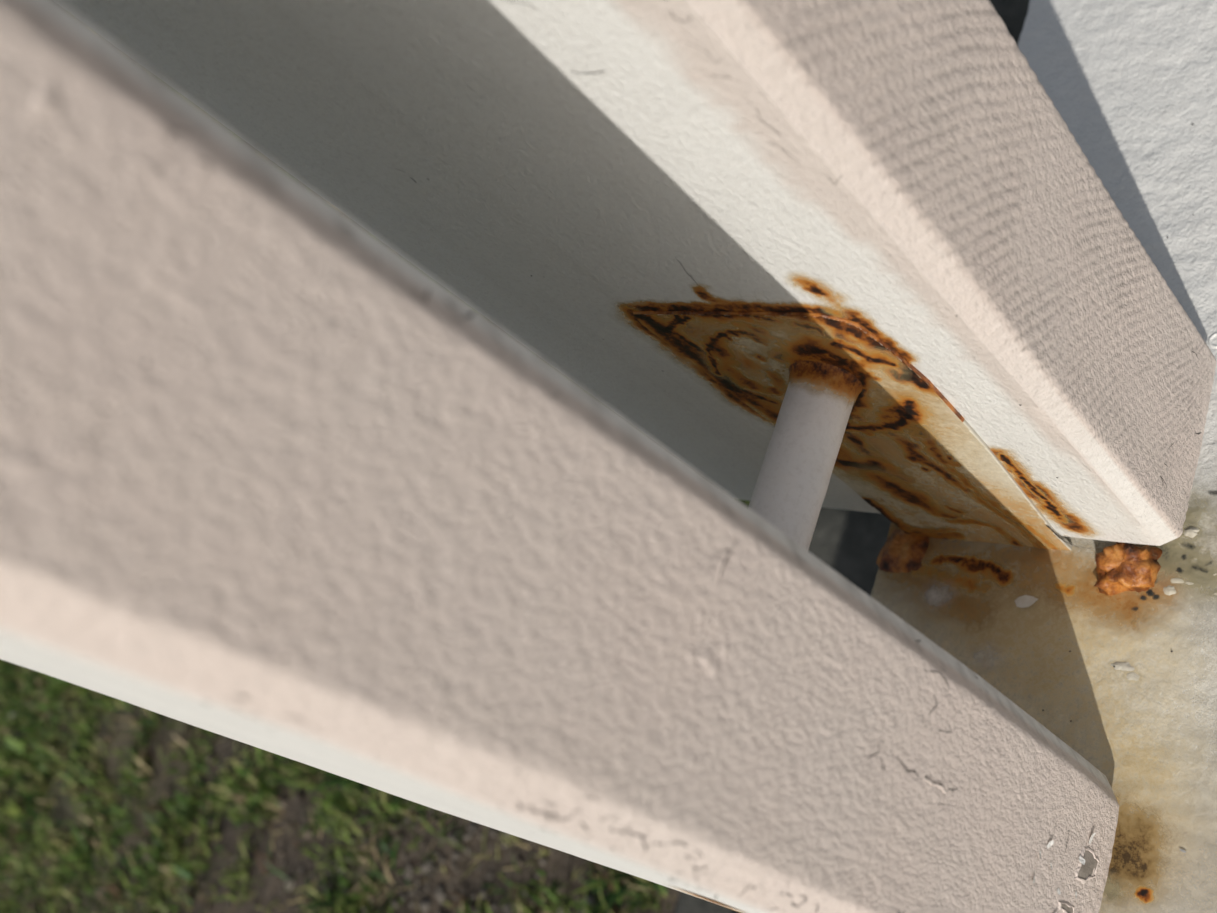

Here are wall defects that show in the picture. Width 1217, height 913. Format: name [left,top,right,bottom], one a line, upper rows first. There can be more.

corrosion [620,276,1094,573]
corrosion [1094,542,1162,596]
water stain [870,492,1217,913]
peeling [1057,833,1099,913]
corrosion [1104,797,1164,904]